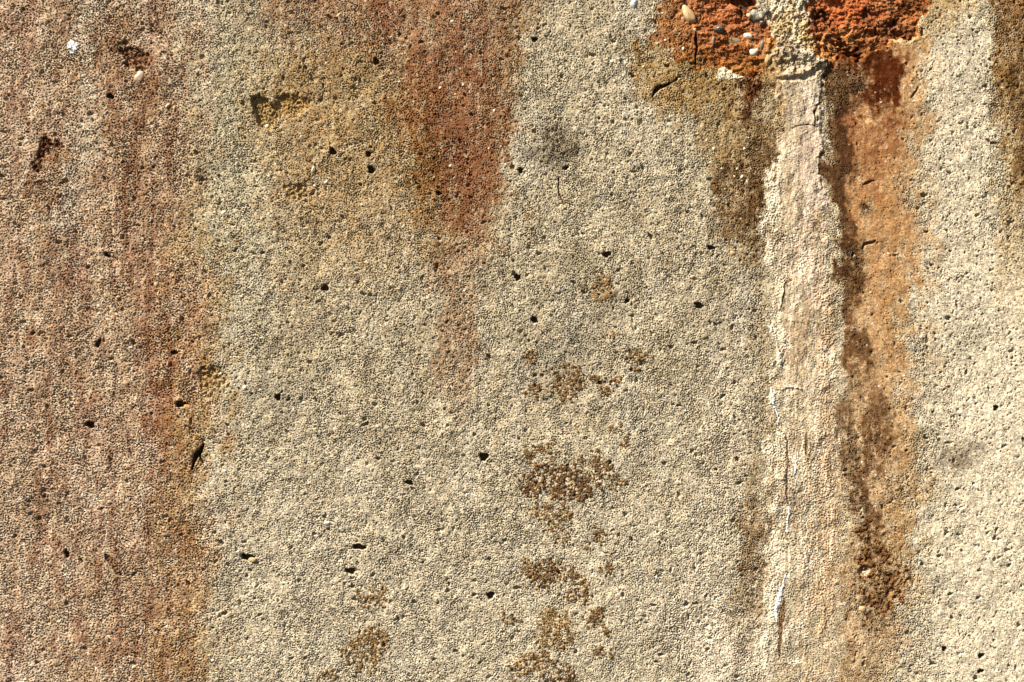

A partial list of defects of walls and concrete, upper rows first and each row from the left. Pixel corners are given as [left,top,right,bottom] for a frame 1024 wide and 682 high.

spalling [644,0,776,81]
spalling [805,0,933,69]
rust [836,48,904,120]
water stain [735,0,872,682]
crack [771,386,808,532]
crack [774,571,786,658]